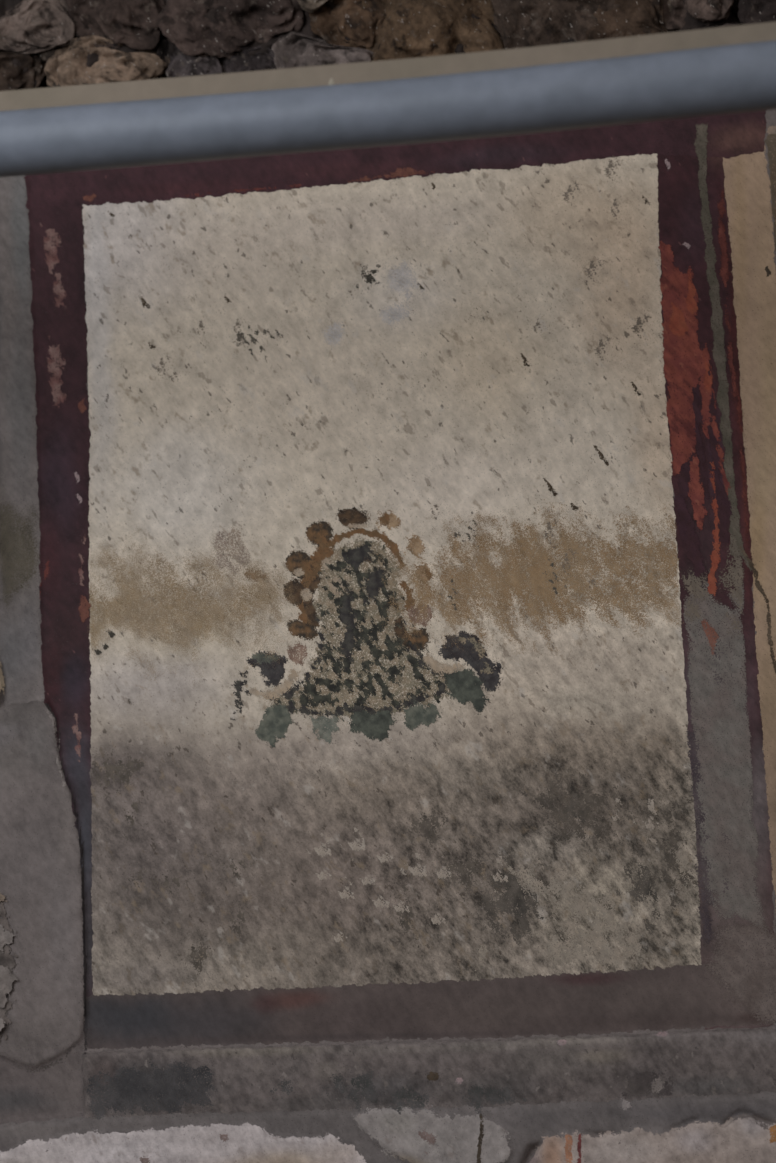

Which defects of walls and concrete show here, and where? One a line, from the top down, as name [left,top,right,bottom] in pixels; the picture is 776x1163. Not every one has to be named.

water stain [348,262,425,325]
water stain [88,523,315,689]
water stain [362,123,776,1027]
spalling [0,893,18,1044]
water stain [181,929,215,982]